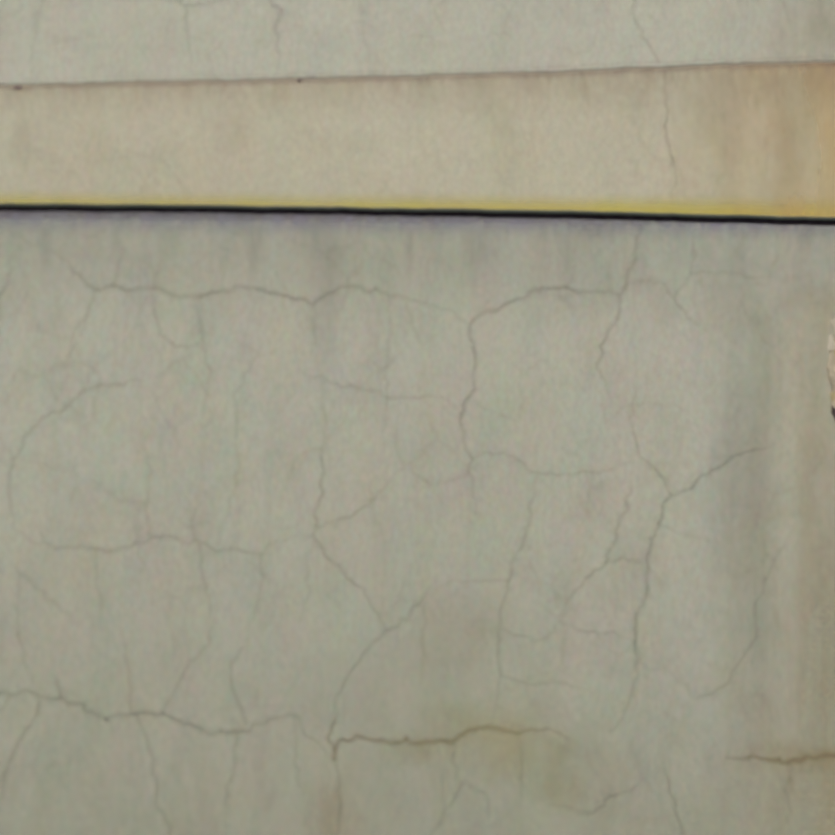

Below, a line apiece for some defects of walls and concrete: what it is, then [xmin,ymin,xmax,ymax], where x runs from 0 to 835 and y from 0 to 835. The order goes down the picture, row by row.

spalling [826,318,835,419]